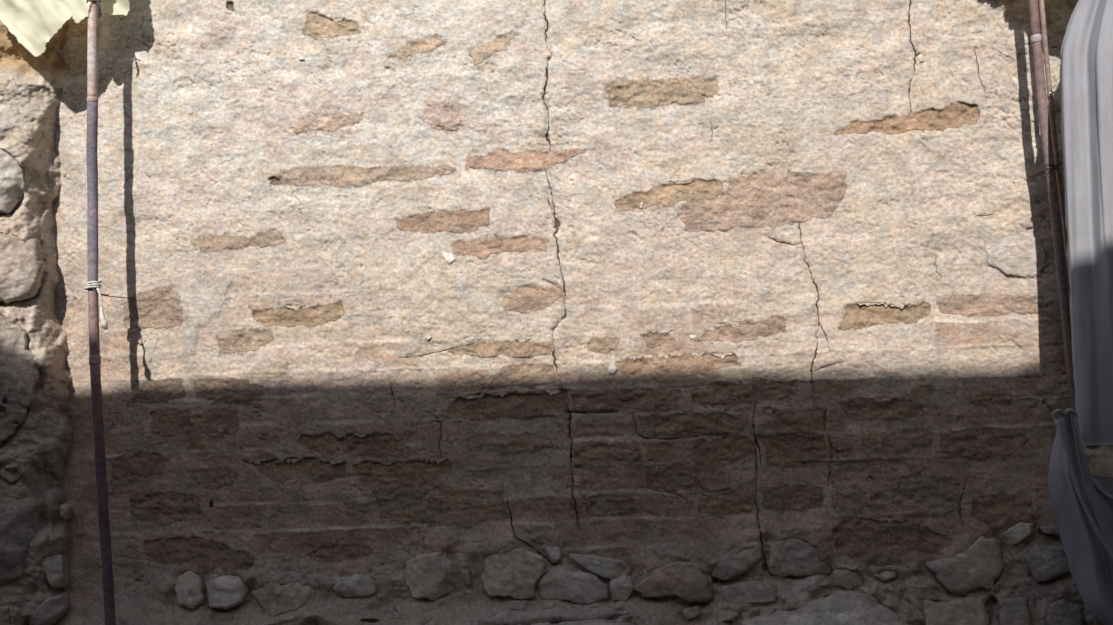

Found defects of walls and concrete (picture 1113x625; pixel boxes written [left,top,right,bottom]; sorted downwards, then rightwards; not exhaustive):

crack [908,0,920,113]
spalling [605,76,719,108]
spalling [834,102,980,134]
spalling [272,148,586,188]
spalling [613,171,847,232]
spalling [395,208,549,264]
spalling [216,301,345,356]
spalling [445,315,798,455]
crack [542,0,768,567]
crack [768,224,851,487]
spalling [838,293,1045,330]
spalling [109,432,506,570]